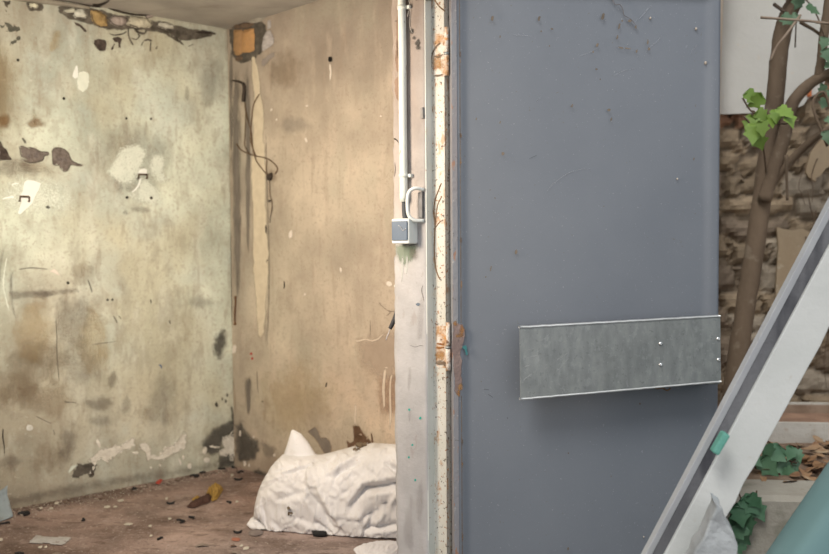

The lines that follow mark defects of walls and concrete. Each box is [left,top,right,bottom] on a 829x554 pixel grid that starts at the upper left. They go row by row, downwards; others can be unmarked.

spalling [58,6,216,52]
spalling [0,141,83,172]
flaking render [229,22,277,338]
leakage [385,377,396,411]
rust [435,322,465,470]
leakage [203,393,266,476]
peeling [347,425,373,448]